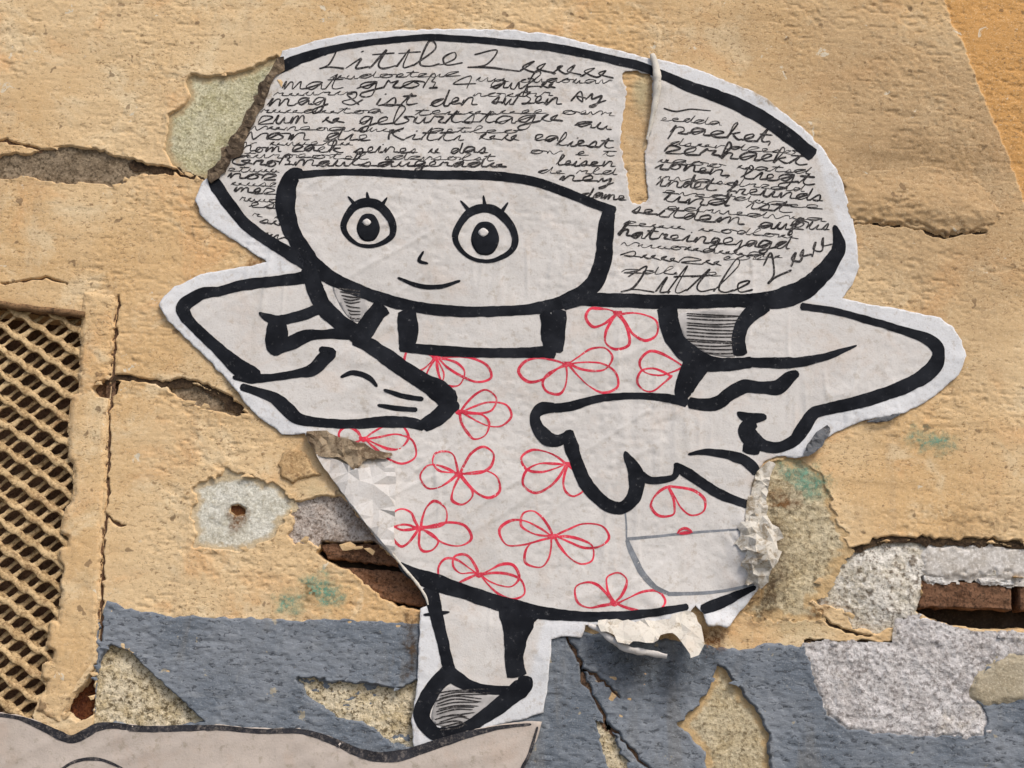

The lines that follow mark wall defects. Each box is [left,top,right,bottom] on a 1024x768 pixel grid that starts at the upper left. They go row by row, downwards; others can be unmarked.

crack [0,139,44,153]
crack [129,160,205,180]
spalling [165,57,283,182]
crack [98,296,245,641]
peeling [190,449,427,609]
spalling [743,458,1024,740]
spalling [88,645,203,726]
spalling [299,677,418,750]
crack [566,636,649,768]
spalling [677,666,770,768]